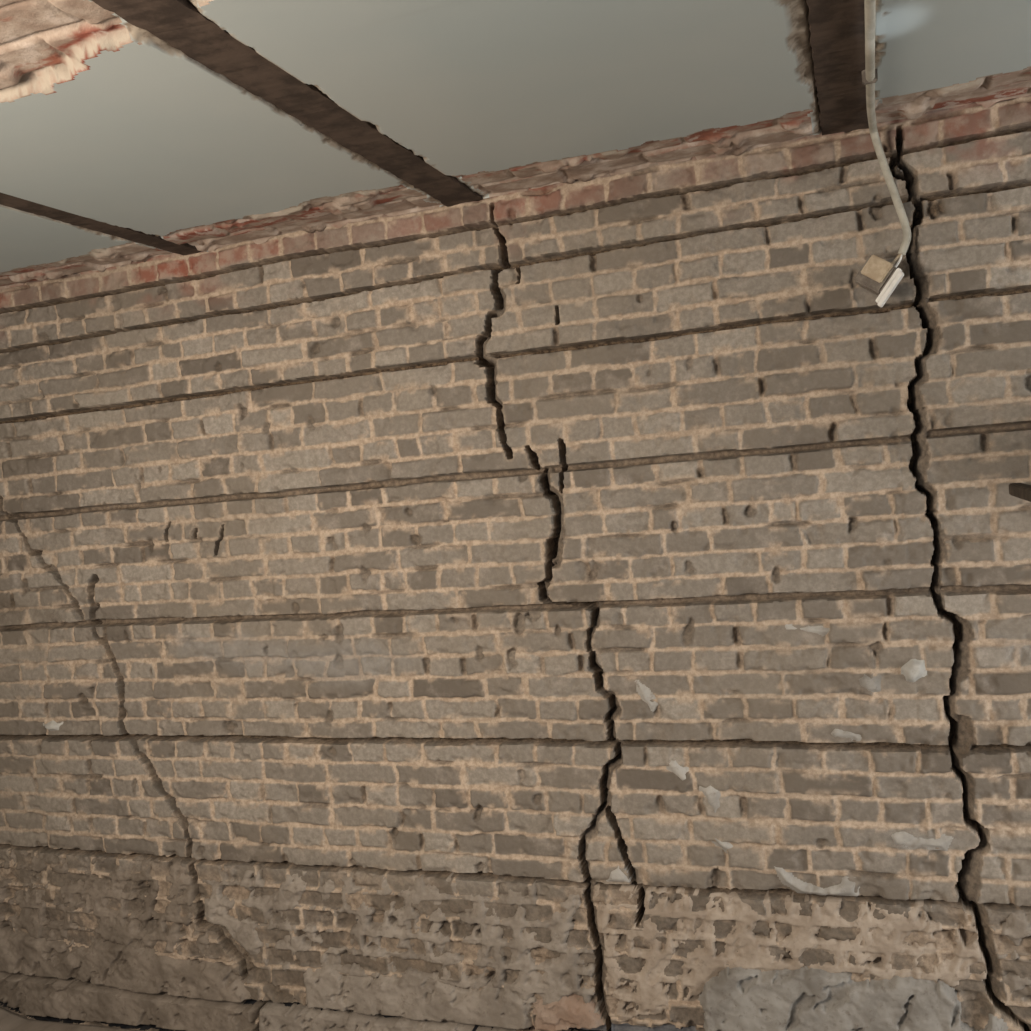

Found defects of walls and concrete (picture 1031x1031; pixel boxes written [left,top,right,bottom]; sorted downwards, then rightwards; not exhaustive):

flaking render [112,0,489,207]
crack [0,495,269,1025]
crack [474,202,645,1031]
crack [888,125,1031,1031]